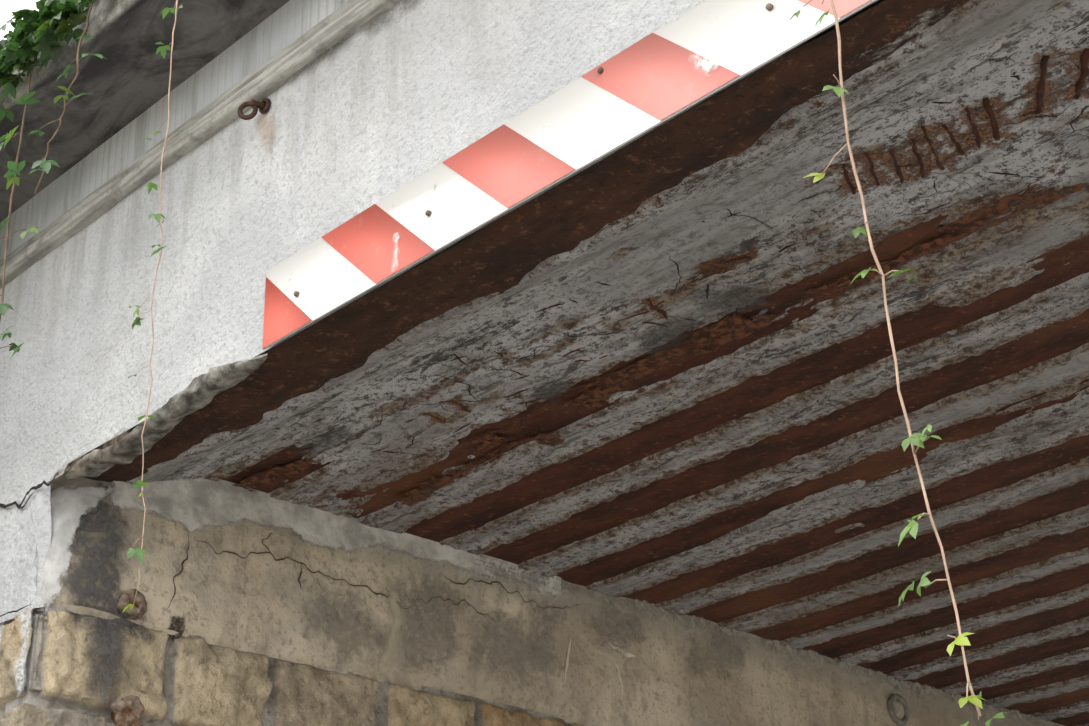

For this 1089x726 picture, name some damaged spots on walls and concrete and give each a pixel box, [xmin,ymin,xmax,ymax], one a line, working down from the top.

peeling [696,57,718,72]
spalling [830,48,1089,196]
spalling [694,251,757,299]
spalling [785,182,1089,294]
spalling [564,294,778,410]
crack [0,431,132,511]
spalling [64,353,268,480]
spalling [234,458,314,492]
spalling [395,397,565,507]
leakage [64,484,148,702]
spalling [168,616,185,641]
crack [164,533,583,622]